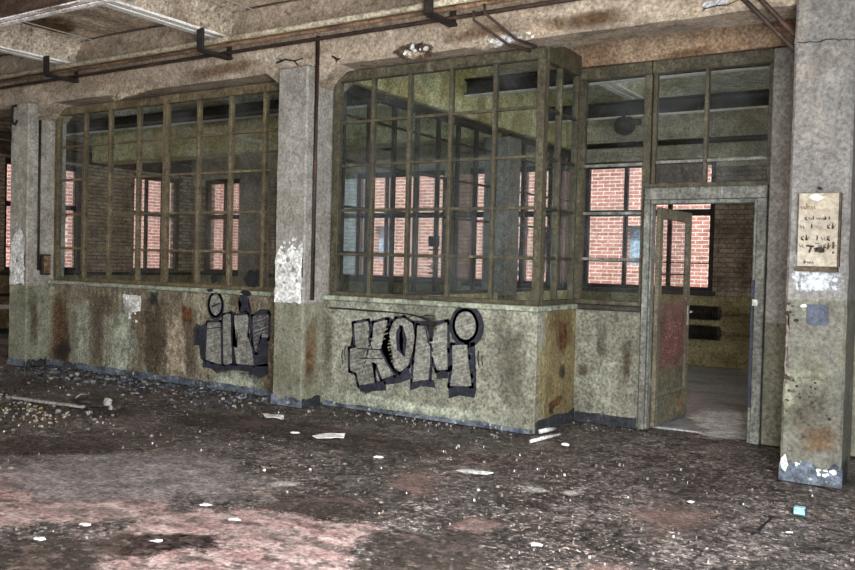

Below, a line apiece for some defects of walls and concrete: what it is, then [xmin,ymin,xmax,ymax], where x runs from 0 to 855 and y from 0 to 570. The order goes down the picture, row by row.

peeling [274,237,303,304]
leakage [76,308,89,363]
leakage [110,293,187,376]
corrosion [558,322,569,347]
peeling [781,454,801,471]